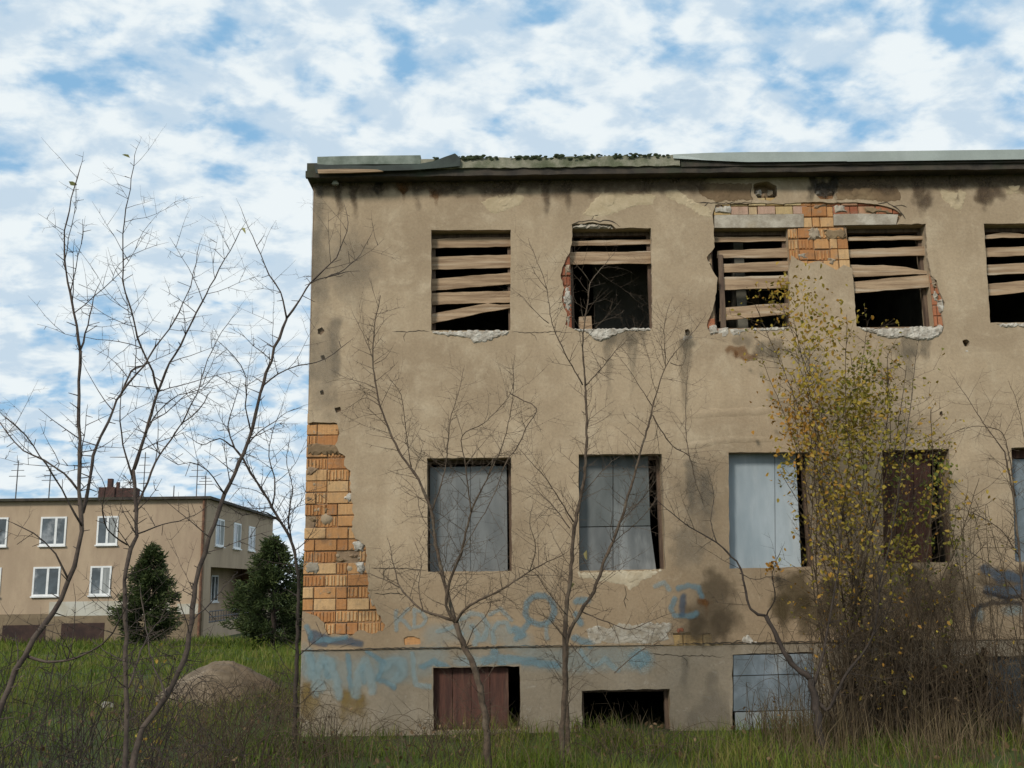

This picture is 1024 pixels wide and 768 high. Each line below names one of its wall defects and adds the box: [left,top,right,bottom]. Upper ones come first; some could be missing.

damp [313,178,707,205]
damp [809,174,1024,207]
flaking render [561,253,572,328]
peeling [592,331,611,342]
flaking render [707,306,740,337]
flaking render [876,274,944,340]
flaking render [303,408,385,635]
flaking render [586,622,723,647]